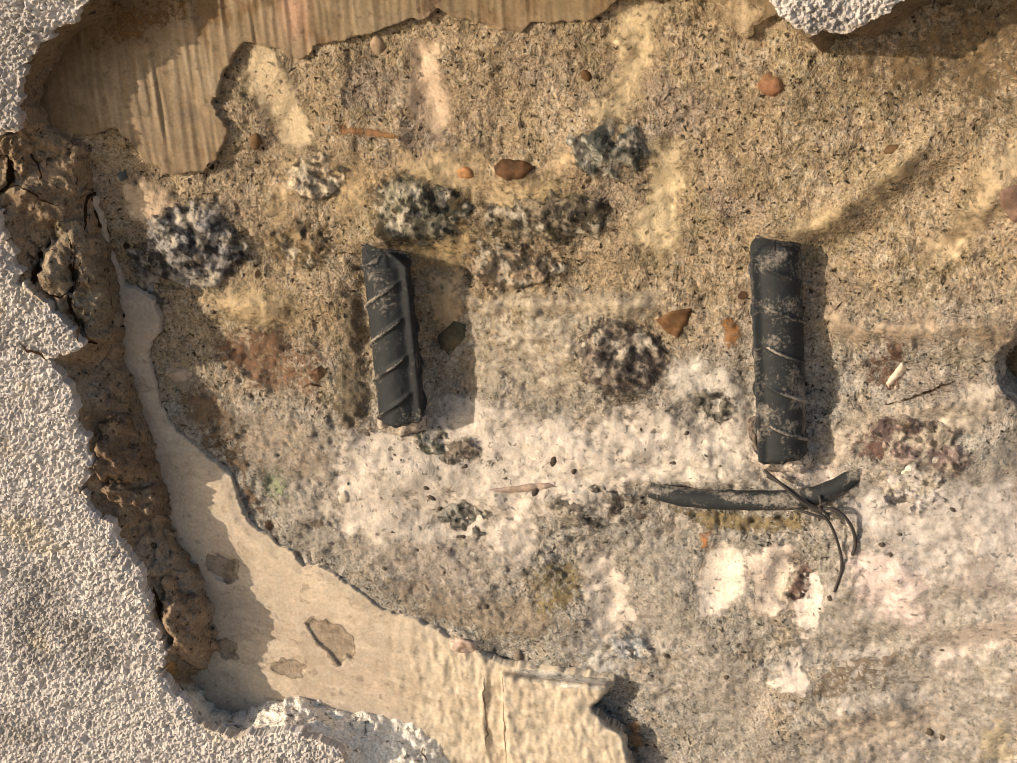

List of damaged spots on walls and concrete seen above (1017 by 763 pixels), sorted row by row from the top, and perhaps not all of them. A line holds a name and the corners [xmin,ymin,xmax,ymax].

crack [0,154,60,206]
crack [31,192,115,344]
spalling [34,279,59,312]
spalling [460,451,499,476]
peeling [872,526,906,558]
spalling [939,531,988,575]
crack [482,675,506,752]